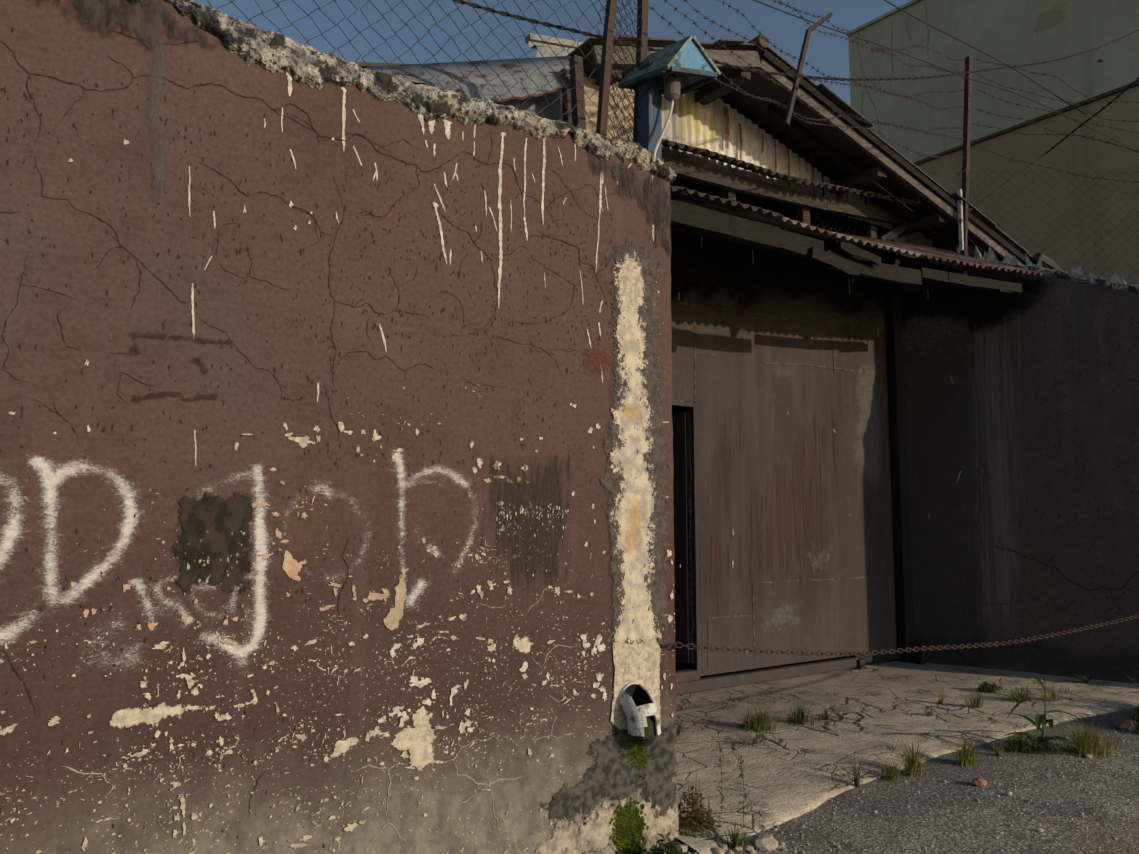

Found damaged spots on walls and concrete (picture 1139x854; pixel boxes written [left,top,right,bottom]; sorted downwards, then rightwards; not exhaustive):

crack [1,22,621,442]
spalling [63,238,674,854]
water stain [903,324,1139,674]
peeling [0,711,27,736]
water stain [535,722,678,854]